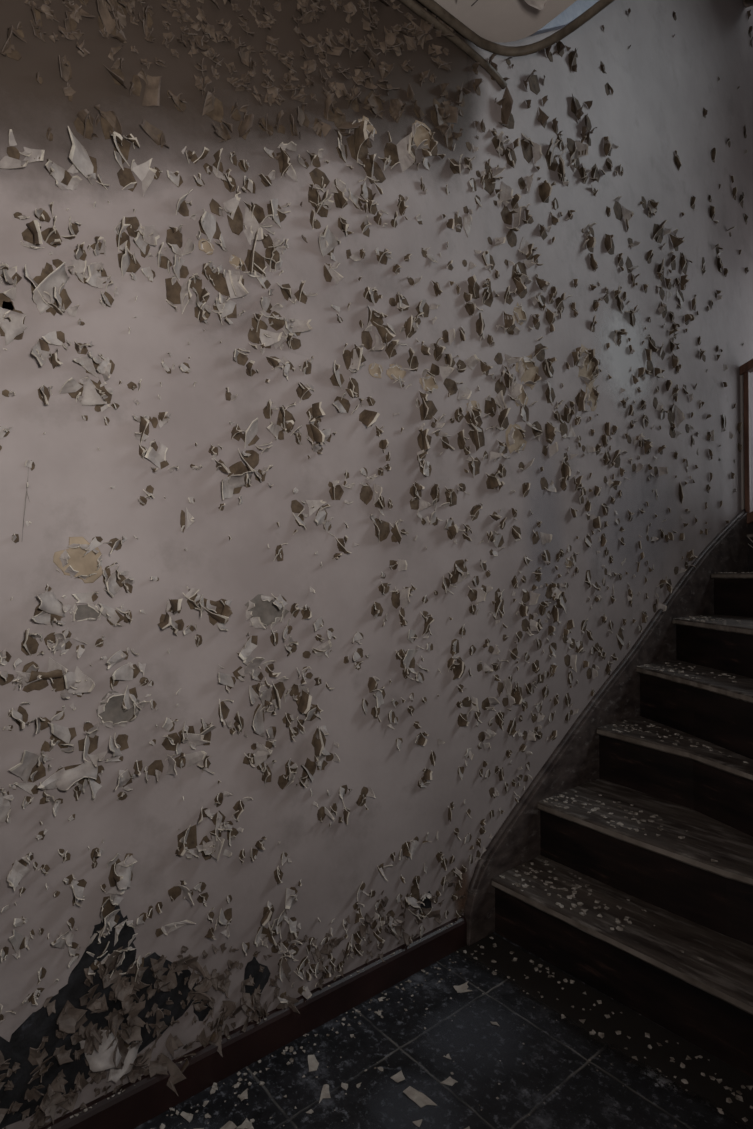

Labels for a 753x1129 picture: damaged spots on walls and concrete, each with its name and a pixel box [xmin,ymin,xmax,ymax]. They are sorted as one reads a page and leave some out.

peeling [0,0,749,802]
peeling [0,535,504,1129]